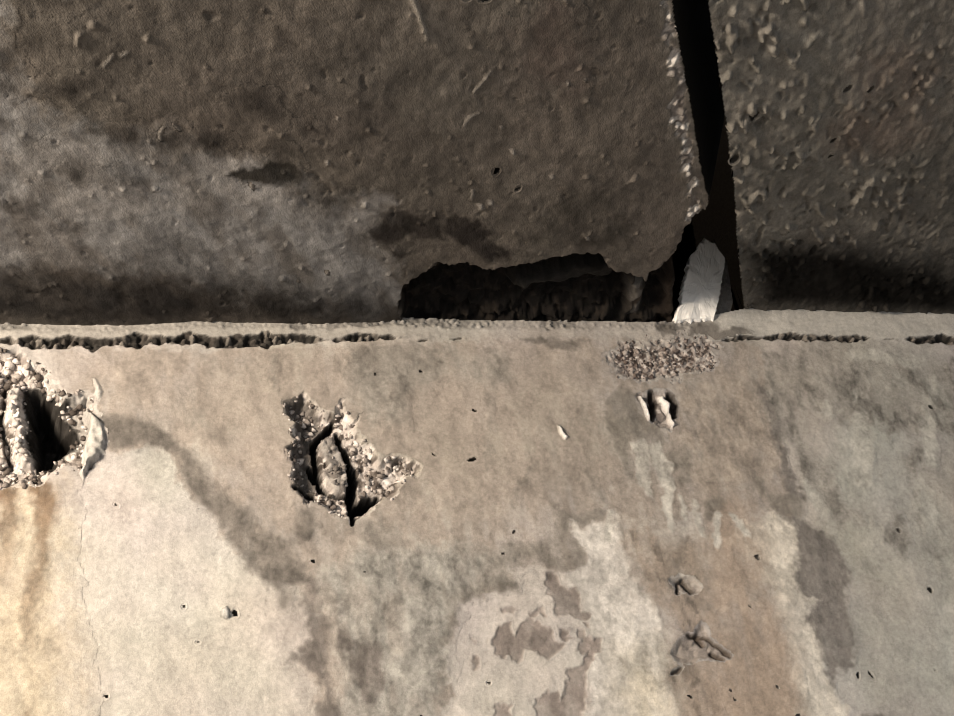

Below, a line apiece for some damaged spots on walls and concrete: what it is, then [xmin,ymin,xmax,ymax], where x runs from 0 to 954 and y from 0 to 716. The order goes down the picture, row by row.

spalling [0,346,110,490]